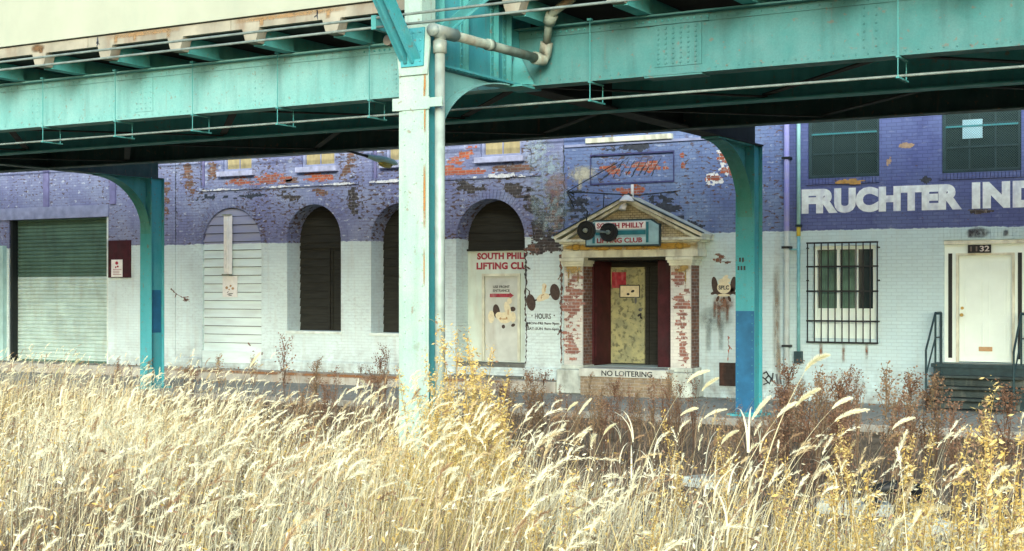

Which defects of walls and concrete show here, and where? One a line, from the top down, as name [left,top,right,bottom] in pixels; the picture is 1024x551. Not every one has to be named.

corrosion [248,9,333,25]
peeling [183,152,364,229]
spalling [445,145,597,255]
spalling [705,150,732,186]
peeling [561,271,585,361]
peeling [671,269,691,366]
corrosion [714,298,730,319]